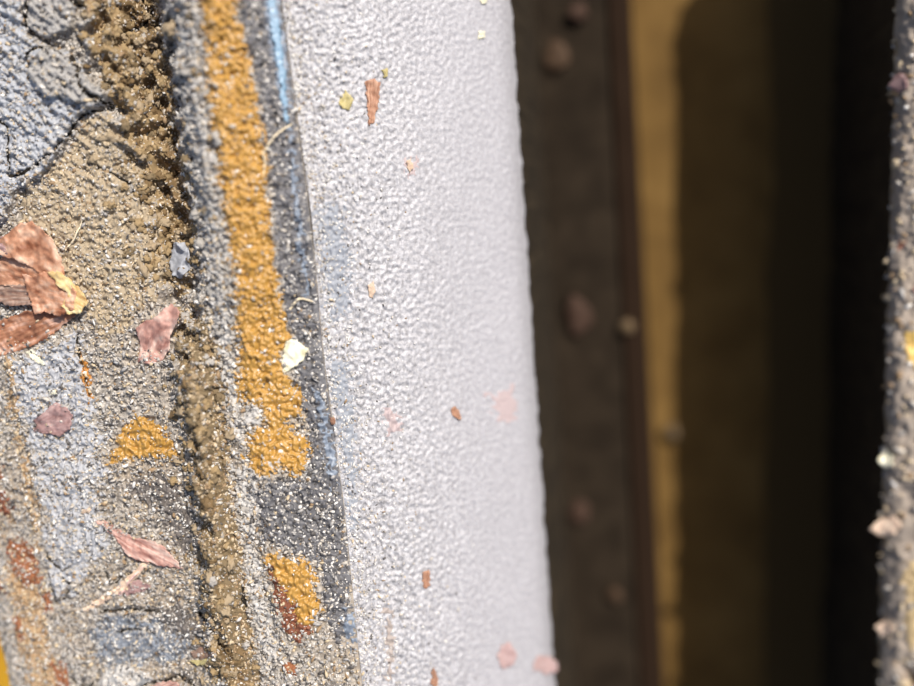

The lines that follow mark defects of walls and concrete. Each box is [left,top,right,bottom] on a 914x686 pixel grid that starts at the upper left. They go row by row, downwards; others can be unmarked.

crack [0,0,113,178]